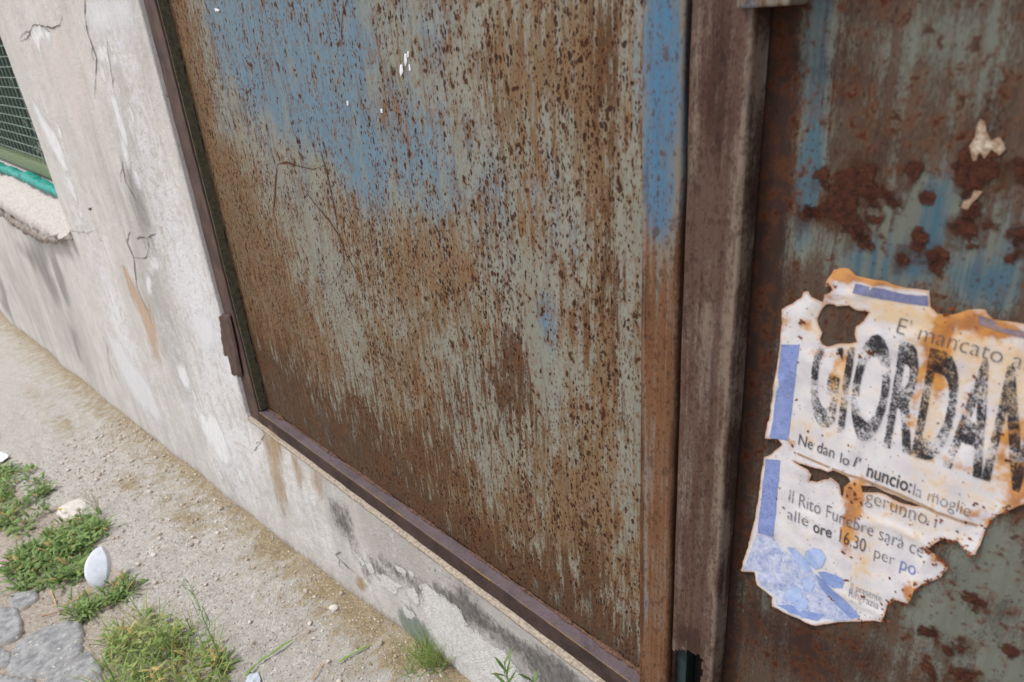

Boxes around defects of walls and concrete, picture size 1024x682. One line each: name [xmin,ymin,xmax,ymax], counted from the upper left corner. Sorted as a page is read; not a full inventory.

crack [19,0,115,96]
crack [70,161,155,316]
rust [799,164,906,252]
rust [902,160,936,206]
rust [895,226,950,276]
rust [947,142,1024,265]
rust [798,470,1011,625]